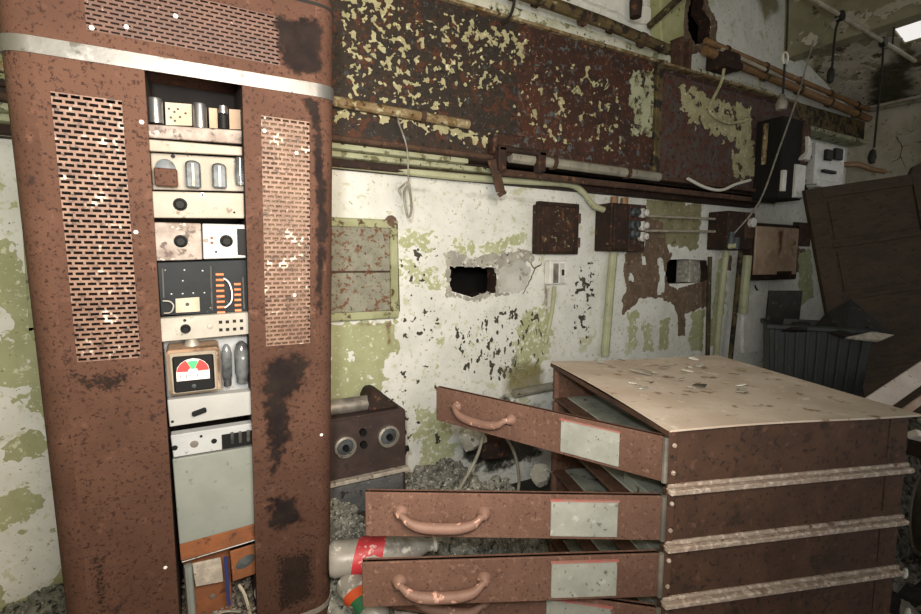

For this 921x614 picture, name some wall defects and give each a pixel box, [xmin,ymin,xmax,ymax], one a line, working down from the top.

flaking render [683,0,718,54]
peeling [801,32,818,47]
peeling [819,32,921,109]
peeling [831,0,921,33]
peeling [0,238,44,417]
flaking render [398,227,535,302]
peeling [570,262,595,343]
flaking render [622,199,732,352]
peeling [331,299,554,466]
peeling [1,427,47,462]
peeling [0,482,45,535]